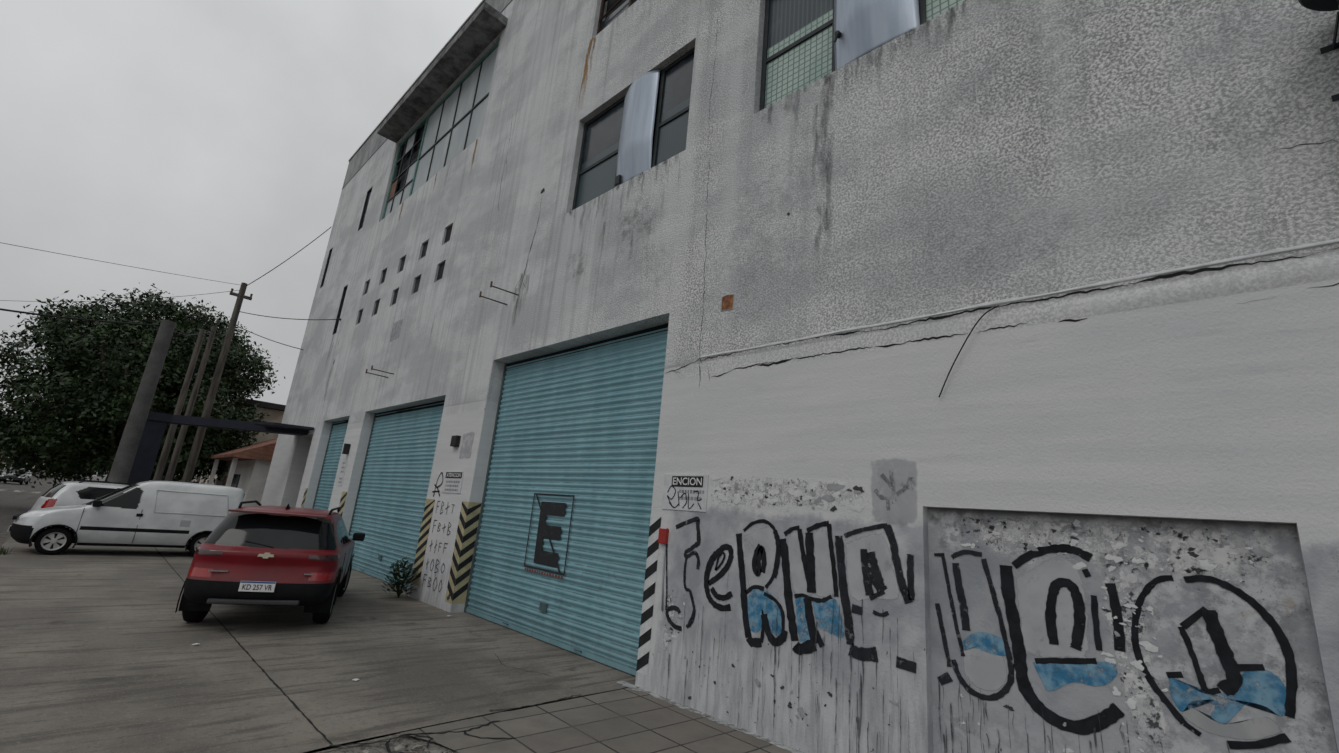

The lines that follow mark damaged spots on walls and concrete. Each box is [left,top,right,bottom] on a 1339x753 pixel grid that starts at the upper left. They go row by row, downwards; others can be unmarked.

crack [667,22,1339,385]
peeling [711,474,904,512]
peeling [950,518,1273,752]